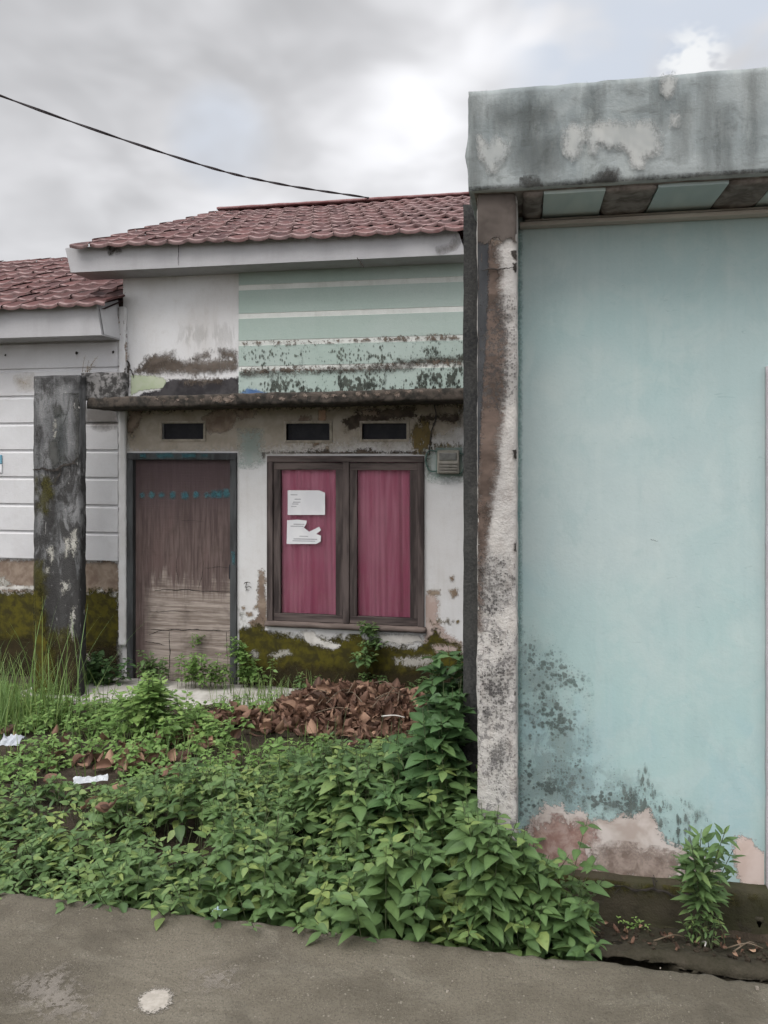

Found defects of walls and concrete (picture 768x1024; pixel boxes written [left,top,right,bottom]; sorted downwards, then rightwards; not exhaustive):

peeling [562,115,680,170]
water stain [563,168,711,185]
peeling [118,317,463,396]
water stain [134,342,463,392]
water stain [53,393,116,462]
water stain [128,404,464,451]
water stain [473,175,699,848]
peeling [0,529,77,593]
peeling [85,560,119,597]
peeling [380,576,463,668]
peeling [525,799,721,882]
peeling [731,835,764,885]